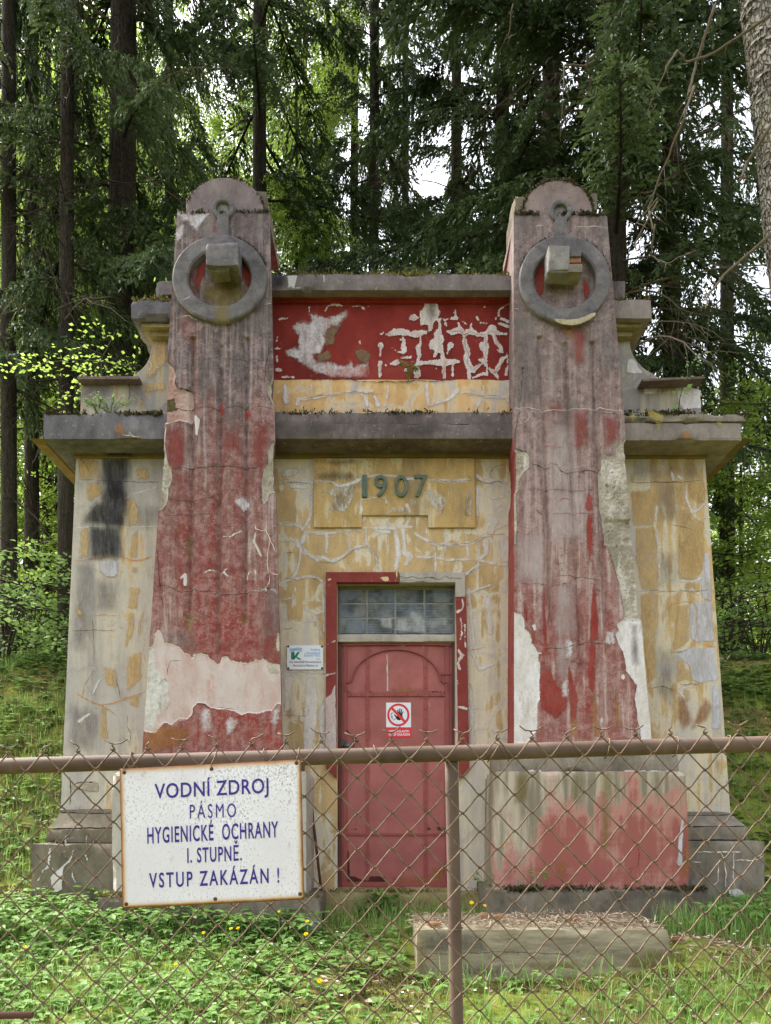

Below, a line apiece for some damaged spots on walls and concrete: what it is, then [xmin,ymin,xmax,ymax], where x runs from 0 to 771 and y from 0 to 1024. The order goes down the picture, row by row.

damp [87,453,131,557]
peeling [104,587,336,749]
crack [75,463,497,645]
peeling [266,304,509,407]
crack [305,331,622,516]
peeling [514,602,578,743]
spalling [586,418,662,739]
peeling [671,472,721,729]